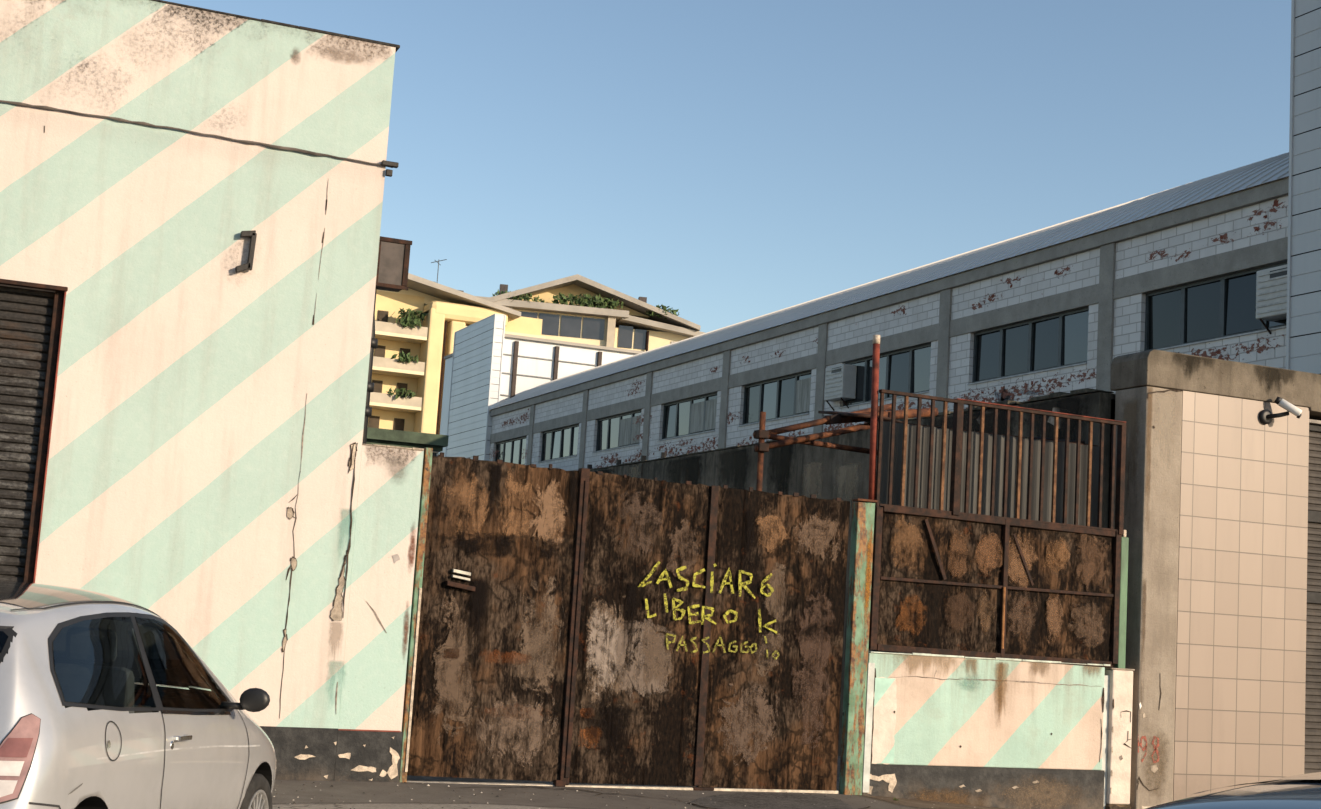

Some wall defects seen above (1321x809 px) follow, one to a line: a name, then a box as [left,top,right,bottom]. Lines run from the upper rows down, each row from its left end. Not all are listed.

damp [165,4,249,29]
damp [316,35,387,61]
peeling [1211,199,1286,245]
peeling [1146,247,1191,262]
peeling [954,368,1096,429]
damp [1174,354,1214,375]
peeling [1178,335,1284,360]
damp [1256,366,1294,390]
peeling [592,412,768,469]
crack [279,394,307,719]
flaking render [330,550,347,655]
peeling [334,737,400,781]